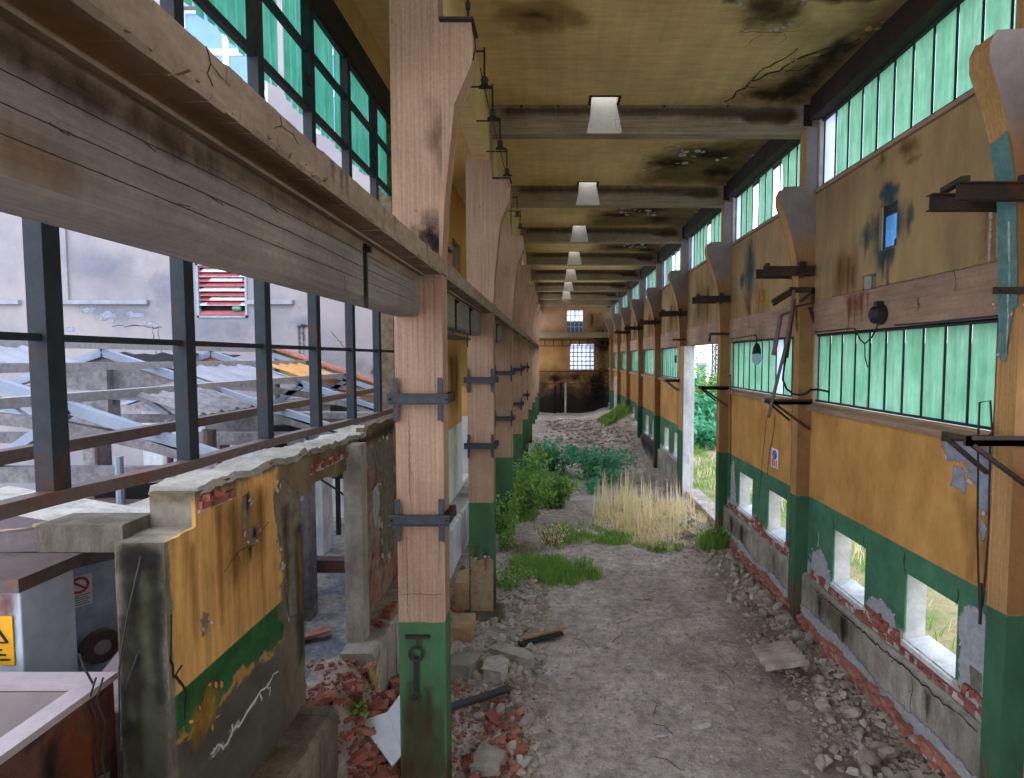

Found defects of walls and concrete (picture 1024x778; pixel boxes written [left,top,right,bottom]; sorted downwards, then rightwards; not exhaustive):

leakage [505,39,852,133]
crack [724,27,860,102]
leakage [428,234,439,251]
leakage [520,139,754,299]
leakage [881,184,912,236]
spalling [728,461,789,558]
peeling [942,441,993,541]
crack [169,615,188,721]
crack [210,671,278,757]
spalling [800,604,977,778]
crack [810,585,977,732]
peeling [810,547,986,722]